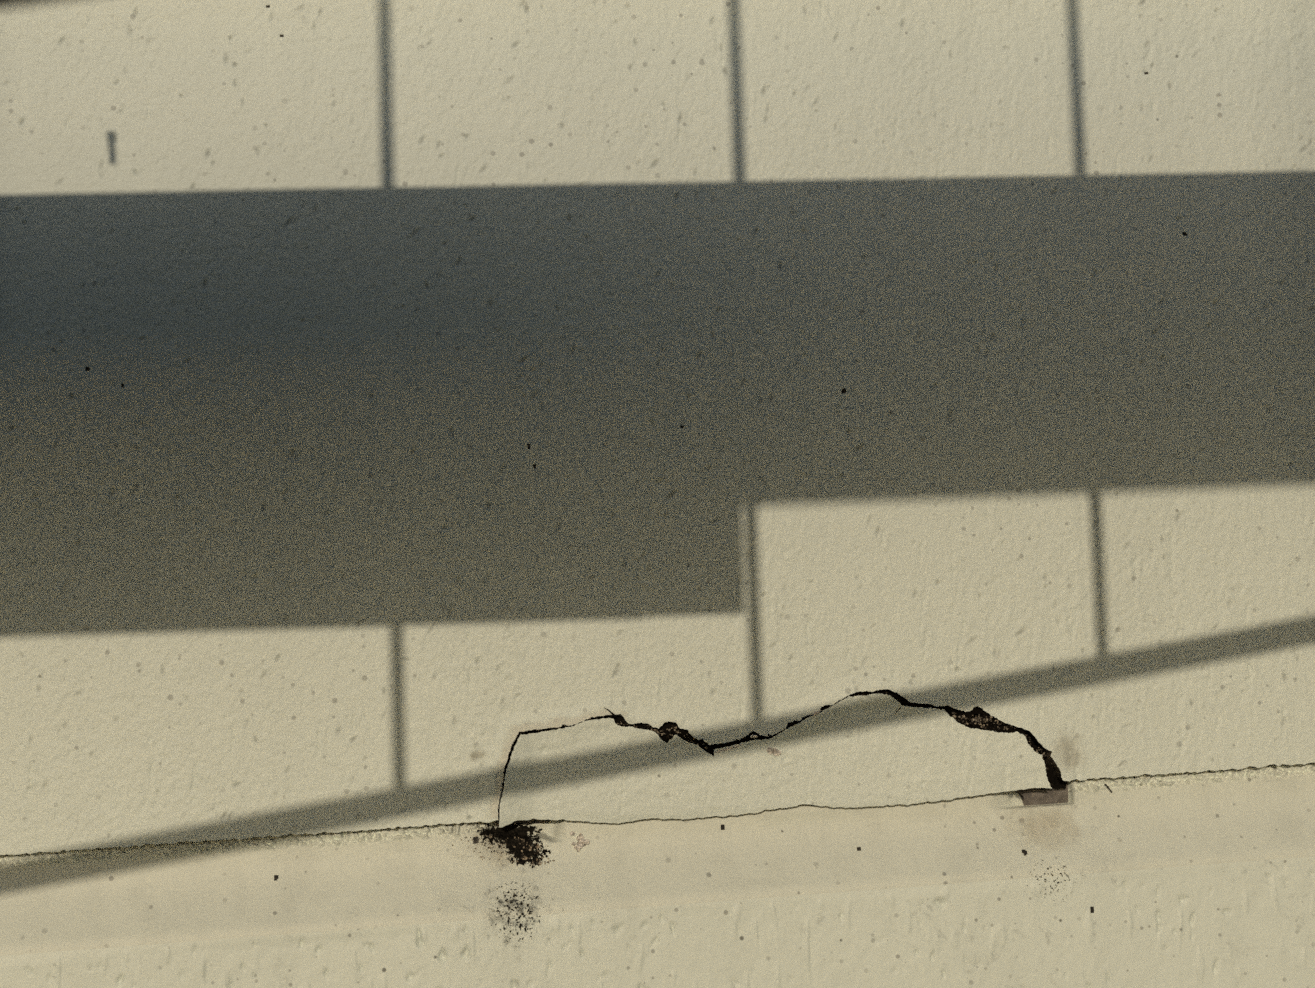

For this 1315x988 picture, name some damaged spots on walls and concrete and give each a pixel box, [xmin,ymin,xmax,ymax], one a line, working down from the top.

crack [492,689,1067,818]